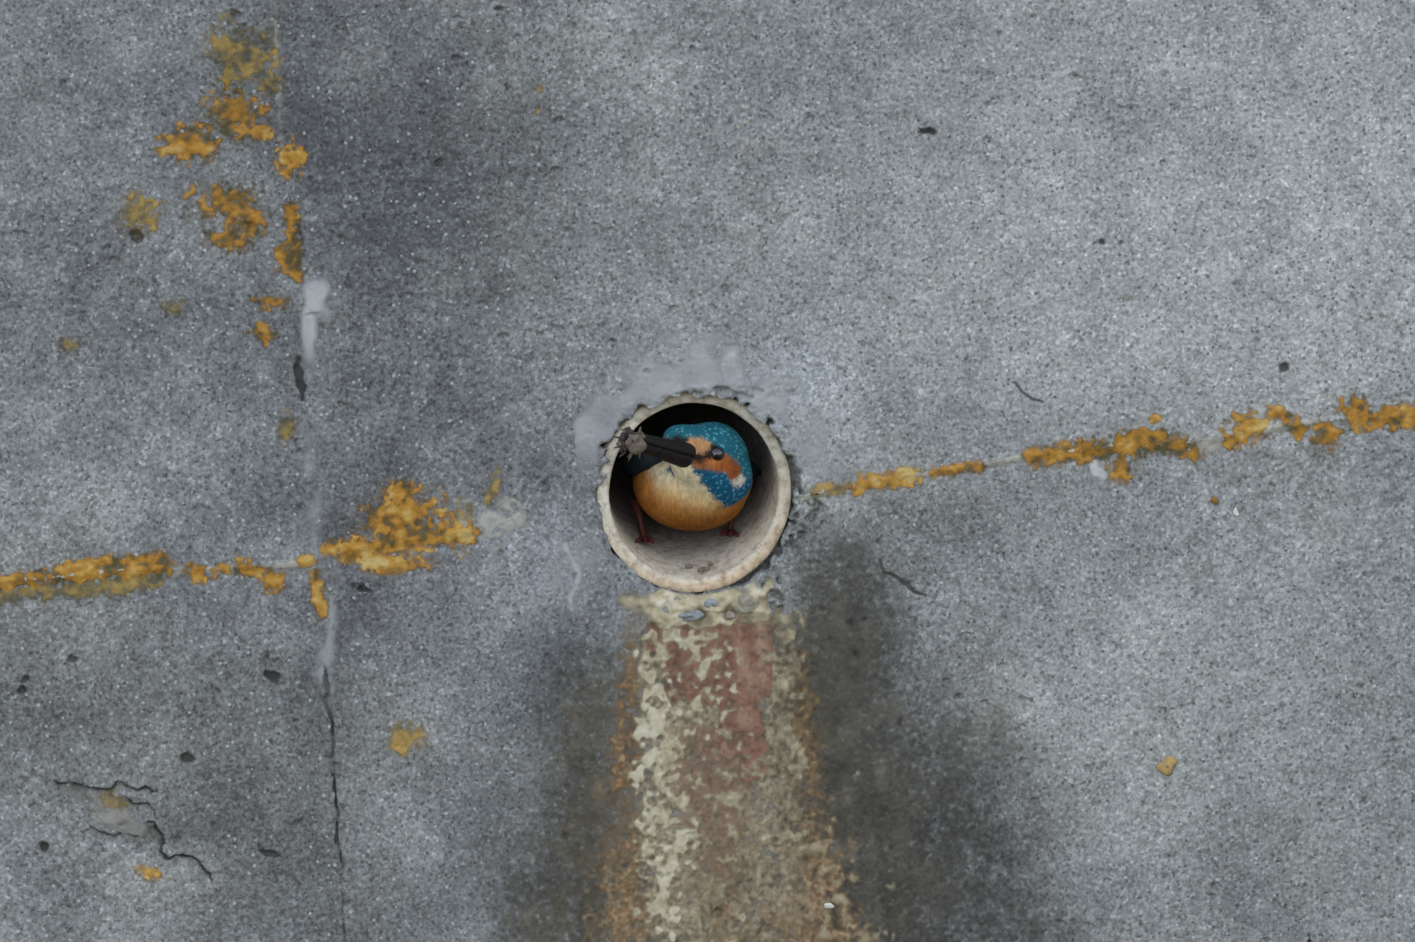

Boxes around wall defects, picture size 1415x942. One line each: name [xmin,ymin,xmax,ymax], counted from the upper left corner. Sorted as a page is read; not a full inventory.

crack [323,674,334,734]
spalling [54,780,213,881]
crack [332,773,341,859]
corrosion [599,820,651,942]
corrosion [610,615,872,942]